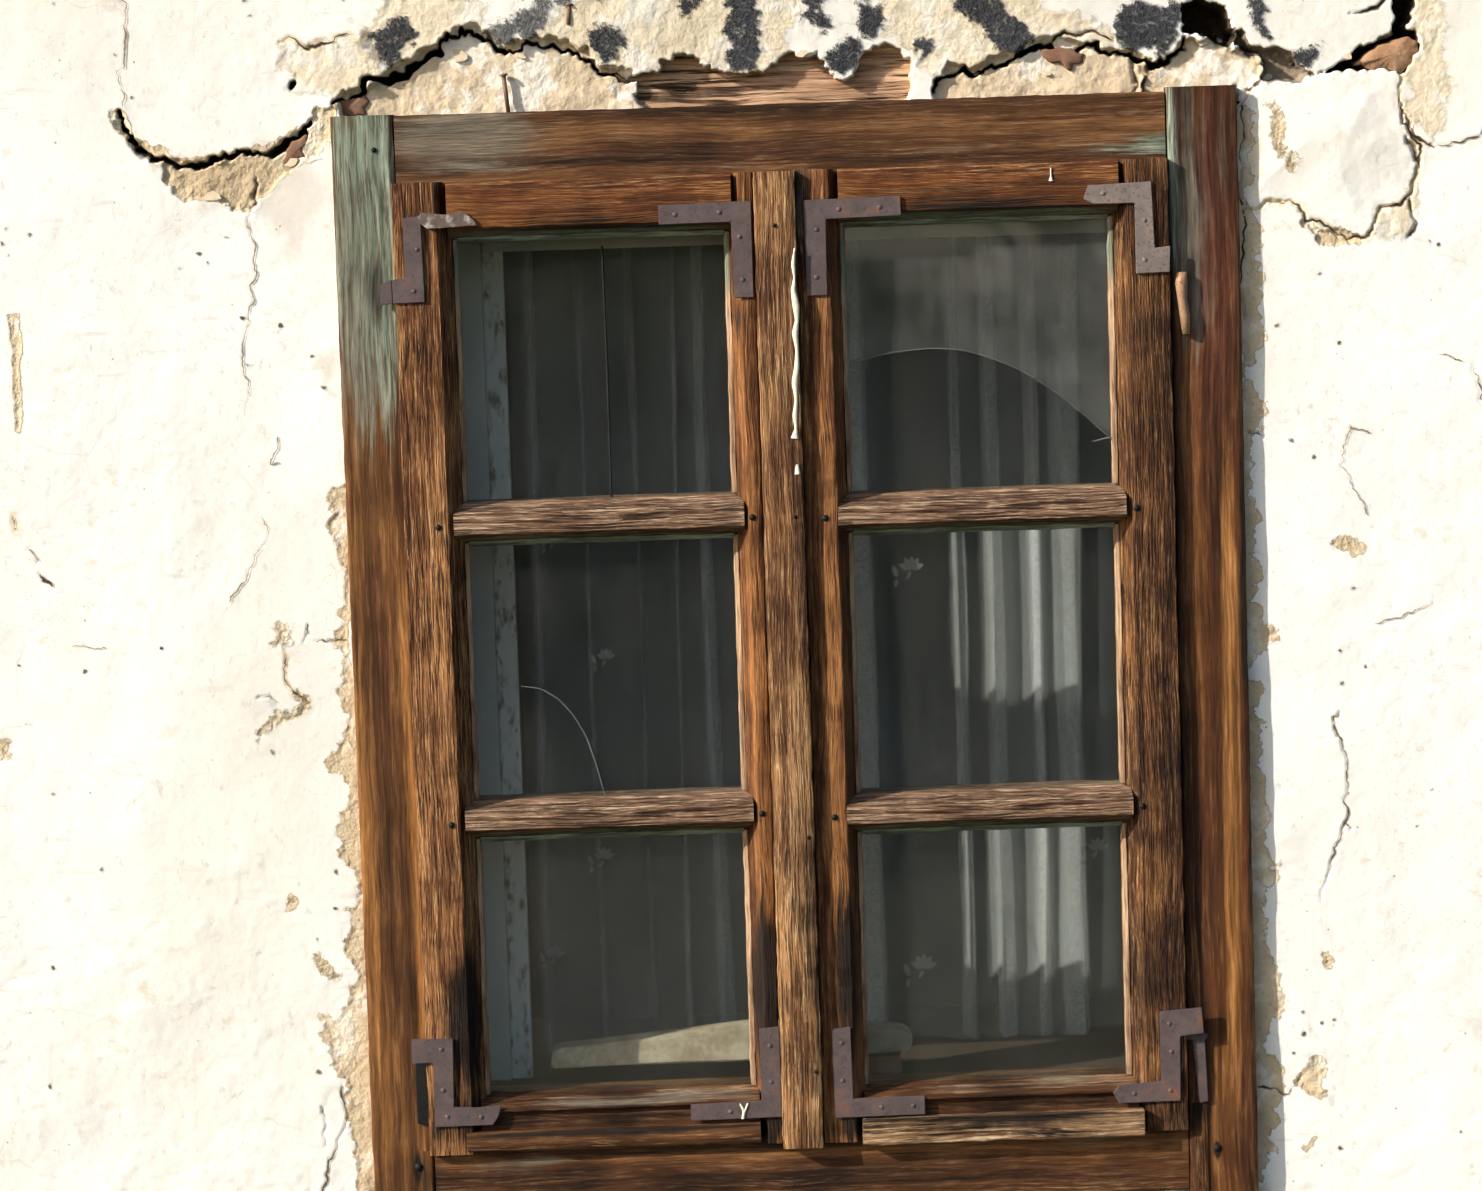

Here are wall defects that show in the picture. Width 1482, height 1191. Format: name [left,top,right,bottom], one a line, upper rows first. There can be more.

crack [1354,0,1386,14]
peeling [1326,0,1452,142]
crack [116,0,639,396]
crack [1236,77,1480,284]
peeling [1299,182,1418,247]
peeling [7,313,23,433]
spalling [108,0,1315,668]
crack [230,518,269,601]
peeling [313,483,375,1191]
crack [1330,714,1350,869]
peeling [1248,679,1328,1182]
crack [322,1085,348,1191]